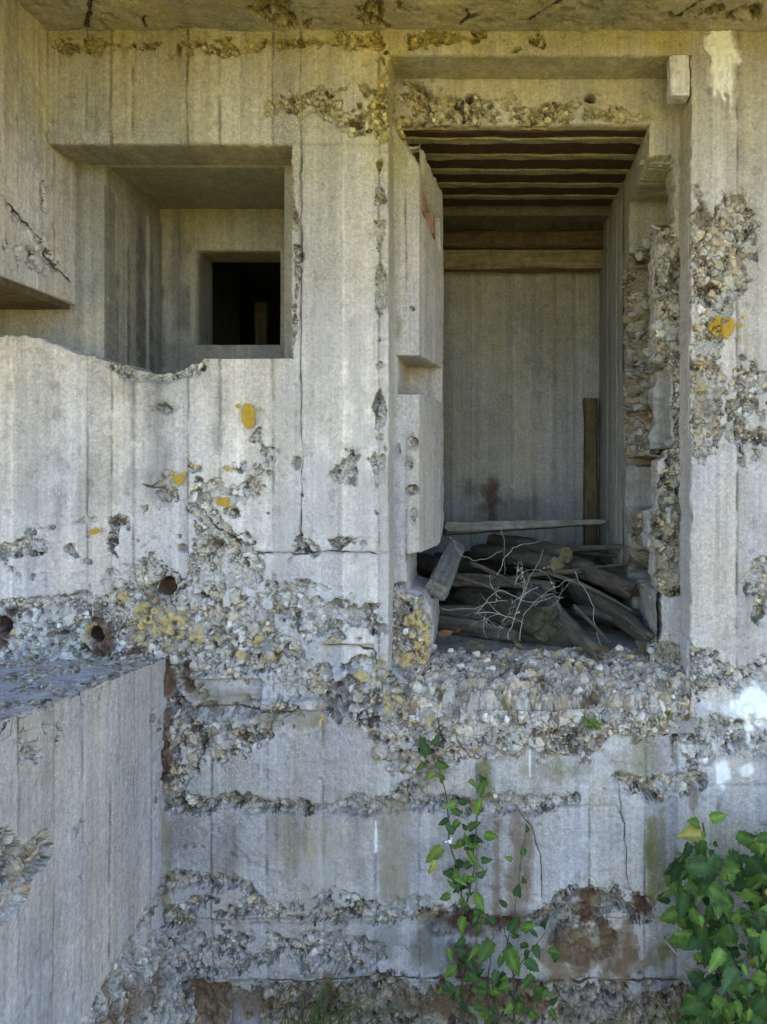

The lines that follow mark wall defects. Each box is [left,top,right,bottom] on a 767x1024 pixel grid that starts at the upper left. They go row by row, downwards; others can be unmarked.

damp [704,29,742,113]
spalling [260,72,654,206]
crack [1,194,71,283]
spalling [620,181,767,598]
spalling [329,386,420,489]
rust [92,617,147,658]
spalling [0,427,767,820]
crack [517,807,542,897]
crack [618,794,629,884]
spalling [80,868,699,1024]
rust [580,890,594,922]
rust [633,895,652,916]